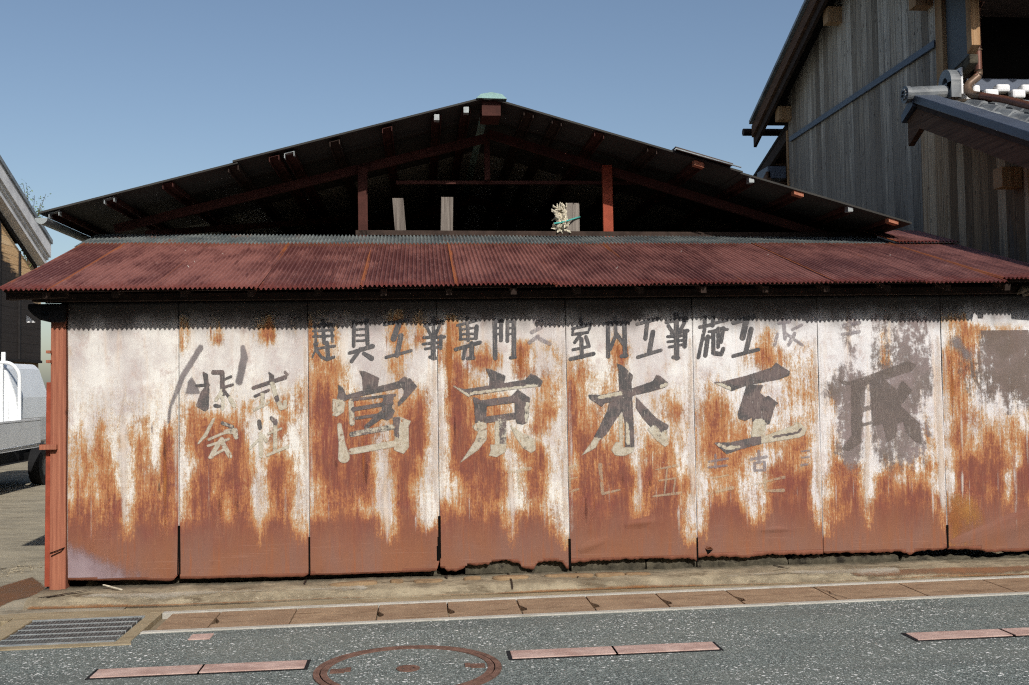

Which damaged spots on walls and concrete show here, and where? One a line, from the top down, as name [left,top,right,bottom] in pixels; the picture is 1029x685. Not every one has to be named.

corrosion [68,309,1029,579]